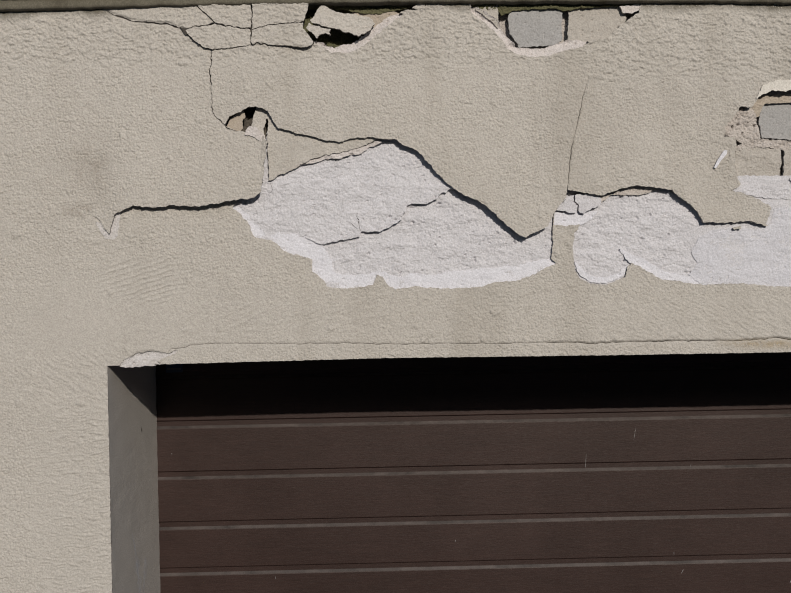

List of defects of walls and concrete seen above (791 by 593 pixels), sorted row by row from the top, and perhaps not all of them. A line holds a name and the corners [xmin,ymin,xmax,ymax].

flaking render [303,4,425,54]
flaking render [471,4,640,57]
crack [109,6,276,124]
flaking render [225,79,791,289]
peeling [120,350,177,368]
crack [258,337,791,345]